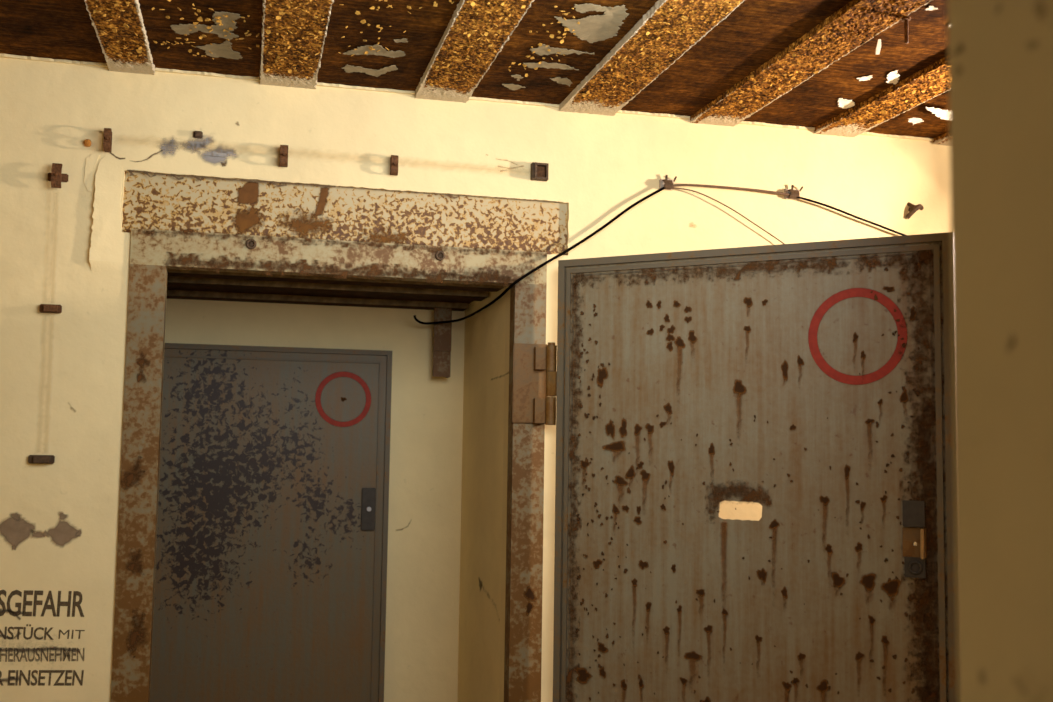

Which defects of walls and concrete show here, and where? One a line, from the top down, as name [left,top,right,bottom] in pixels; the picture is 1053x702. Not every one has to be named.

peeling [170,12,243,60]
peeling [342,38,408,77]
peeling [502,3,629,90]
peeling [837,98,855,109]
peeling [886,70,900,84]
peeling [908,107,949,125]
corrosion [174,182,547,257]
corrosion [165,252,516,287]
corrosion [646,300,697,384]
corrosion [566,273,672,702]
corrosion [695,434,776,569]
corrosion [818,244,949,702]